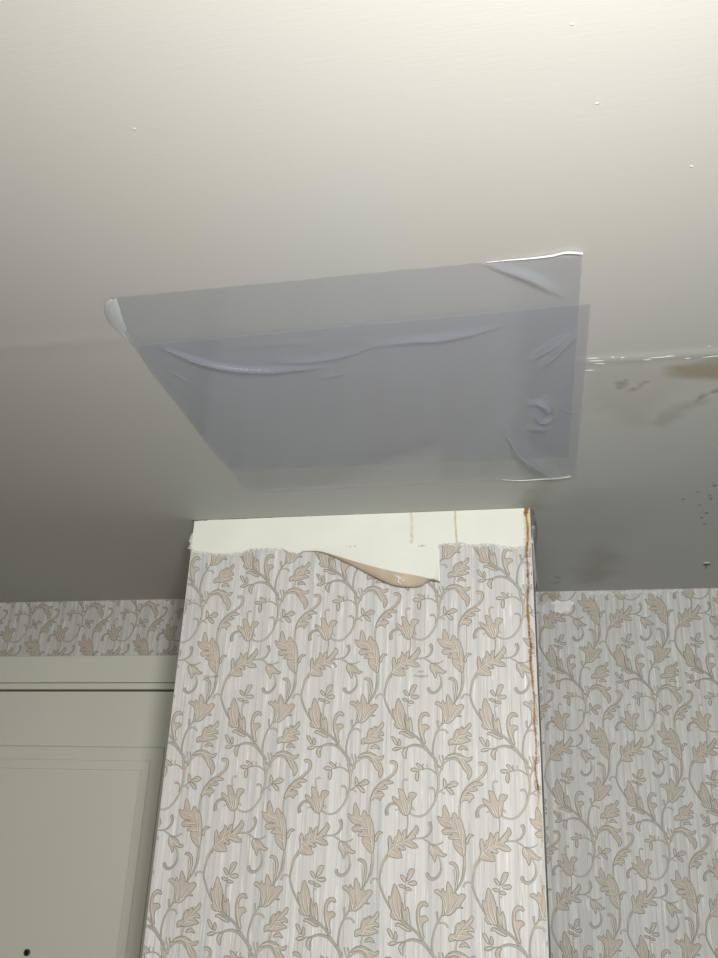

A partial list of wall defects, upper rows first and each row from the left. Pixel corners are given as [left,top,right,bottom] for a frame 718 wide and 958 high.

corrosion [524,508,538,790]